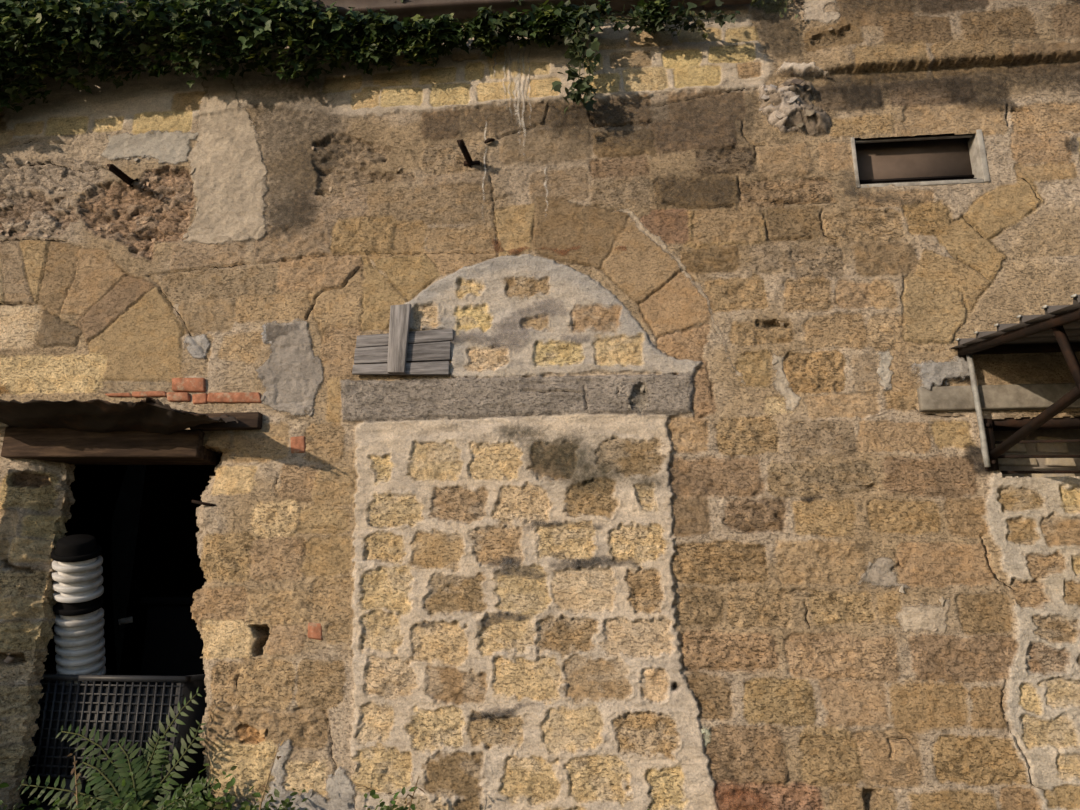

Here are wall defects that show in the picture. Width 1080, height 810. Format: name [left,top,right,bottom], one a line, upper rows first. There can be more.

flaking render [0,70,268,260]
spalling [311,132,418,198]
spalling [10,471,54,488]
crack [982,539,1014,591]
crack [1001,685,1044,790]